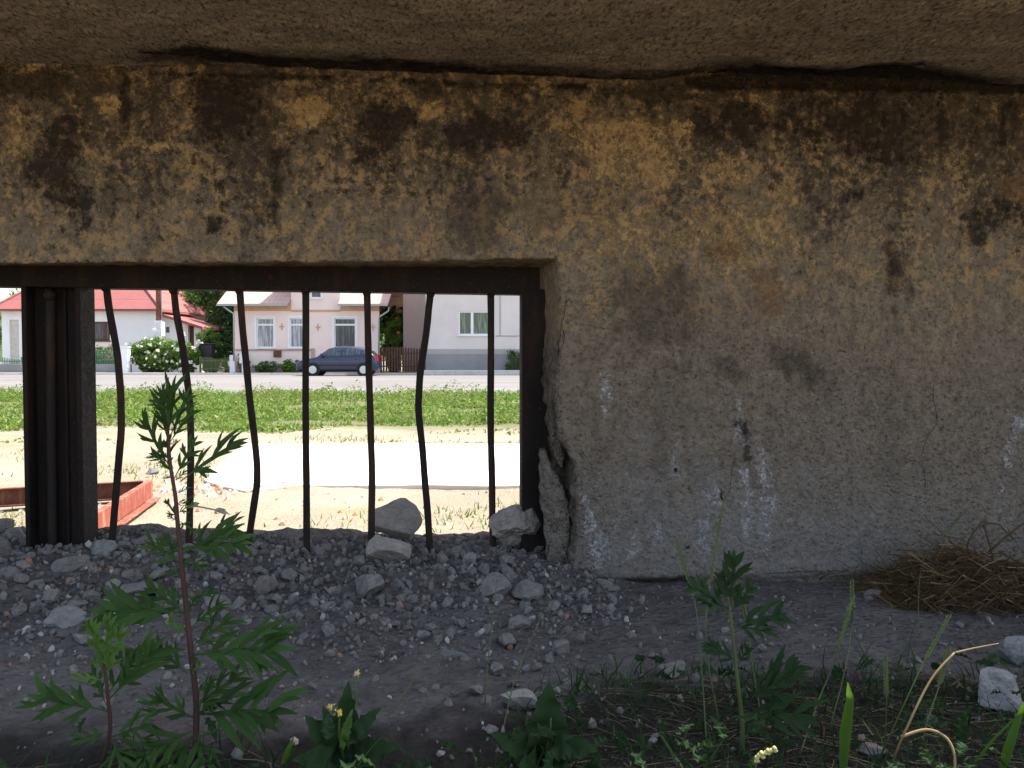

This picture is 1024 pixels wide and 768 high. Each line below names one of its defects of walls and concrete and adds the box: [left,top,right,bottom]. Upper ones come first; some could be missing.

leakage [0,67,69,101]
leakage [14,104,96,238]
leakage [119,75,133,129]
leakage [187,75,262,235]
leakage [270,147,287,218]
leakage [352,95,417,175]
crack [144,47,1024,95]
leakage [384,59,1022,172]
leakage [960,194,1024,251]
leakage [886,247,903,288]
leakage [732,401,776,552]